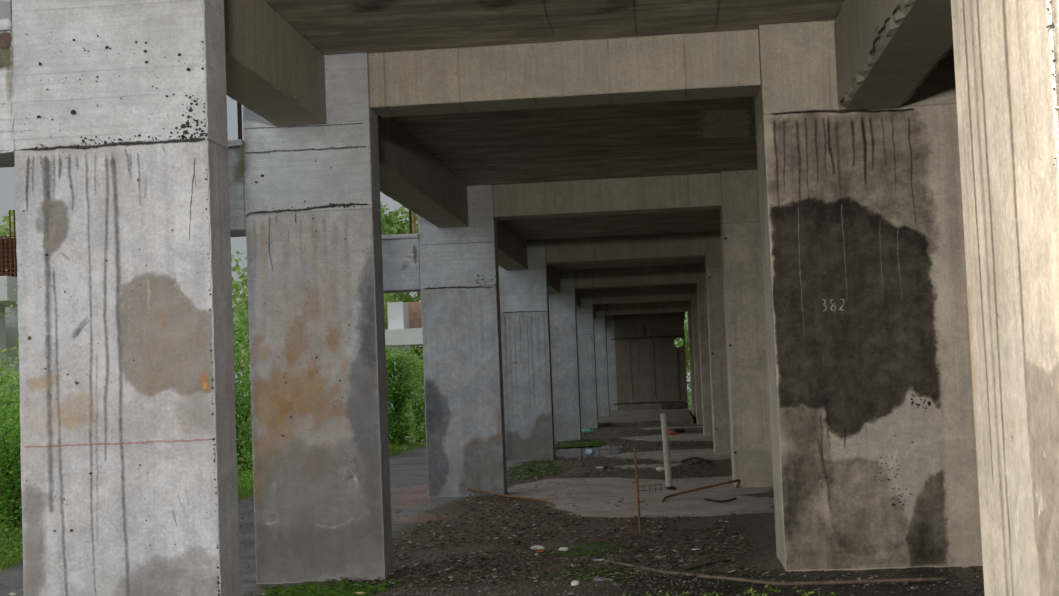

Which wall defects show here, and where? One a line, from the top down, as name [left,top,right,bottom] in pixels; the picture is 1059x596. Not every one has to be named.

spalling [0,0,12,68]
water stain [38,158,70,313]
water stain [104,224,214,395]
water stain [771,119,940,525]
water stain [962,0,1013,596]
water stain [907,472,946,565]